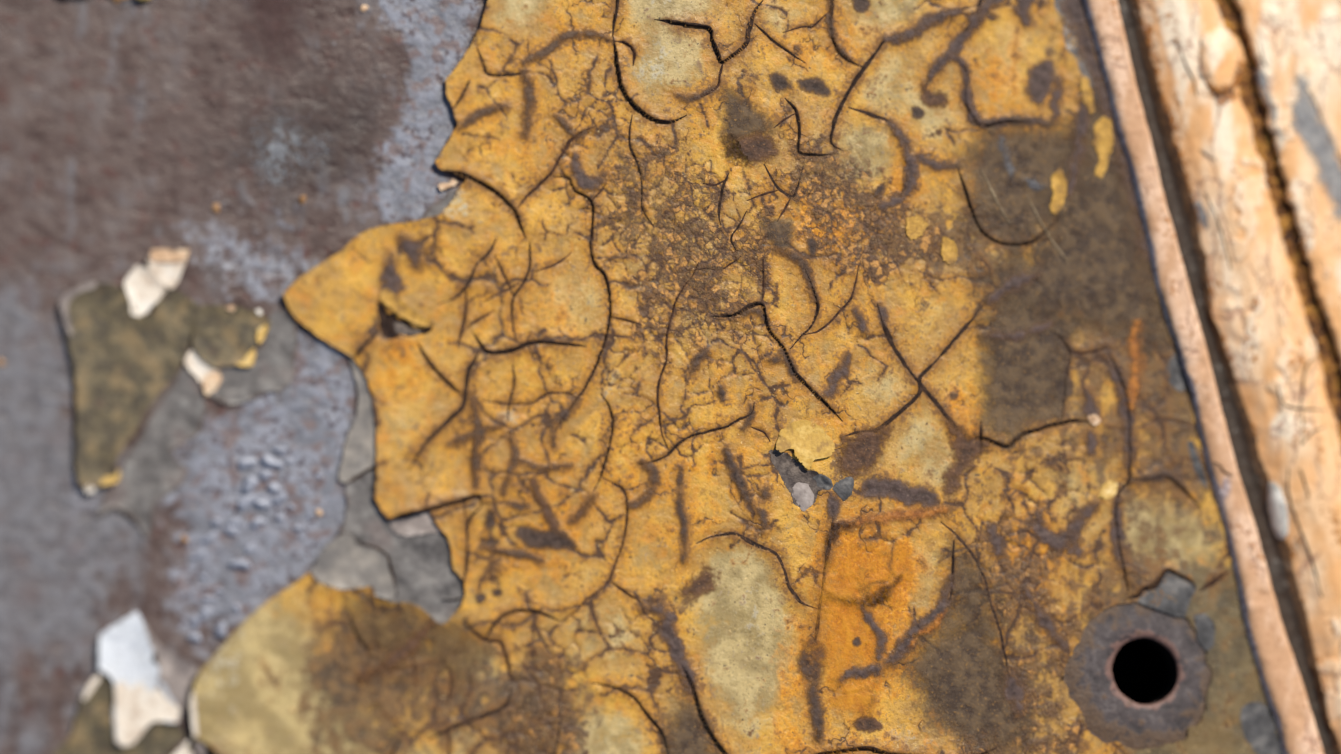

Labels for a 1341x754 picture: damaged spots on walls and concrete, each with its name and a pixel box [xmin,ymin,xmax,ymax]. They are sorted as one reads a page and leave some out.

rust [677,87,779,167]
rust [378,237,423,295]
rust [571,144,770,324]
rust [761,0,1182,568]
peeling [0,0,488,754]
crack [335,0,1233,754]
rust [627,459,660,509]
rust [676,467,688,561]
rust [679,566,721,602]
rust [723,448,771,532]
rust [798,541,1031,744]
rust [1024,587,1212,750]